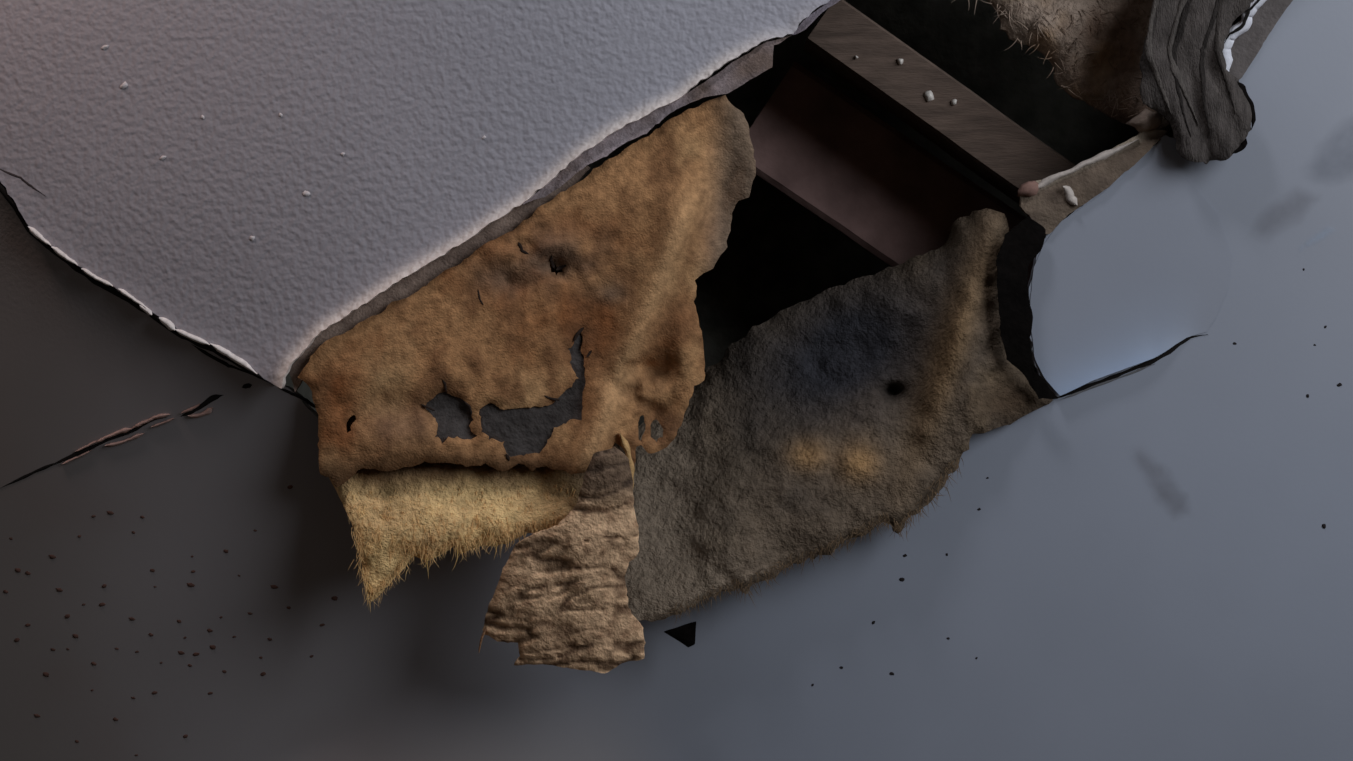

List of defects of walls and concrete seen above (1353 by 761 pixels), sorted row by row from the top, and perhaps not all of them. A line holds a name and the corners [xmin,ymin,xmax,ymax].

crack [0,169,316,488]
peeling [1030,166,1232,396]